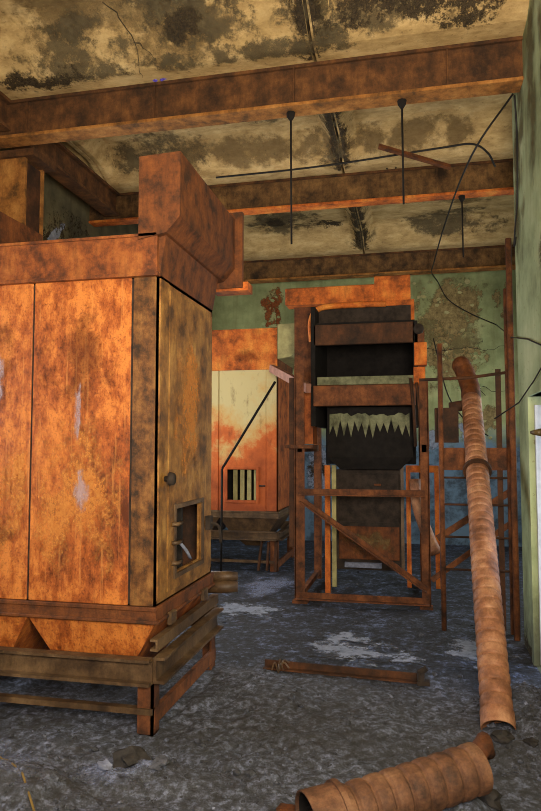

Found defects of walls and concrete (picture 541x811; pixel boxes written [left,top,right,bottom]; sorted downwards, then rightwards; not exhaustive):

damp [0,0,505,92]
damp [513,7,541,185]
damp [109,112,473,174]
damp [247,206,376,250]
damp [405,195,524,250]
peeling [411,278,489,389]
peeling [429,430,439,450]